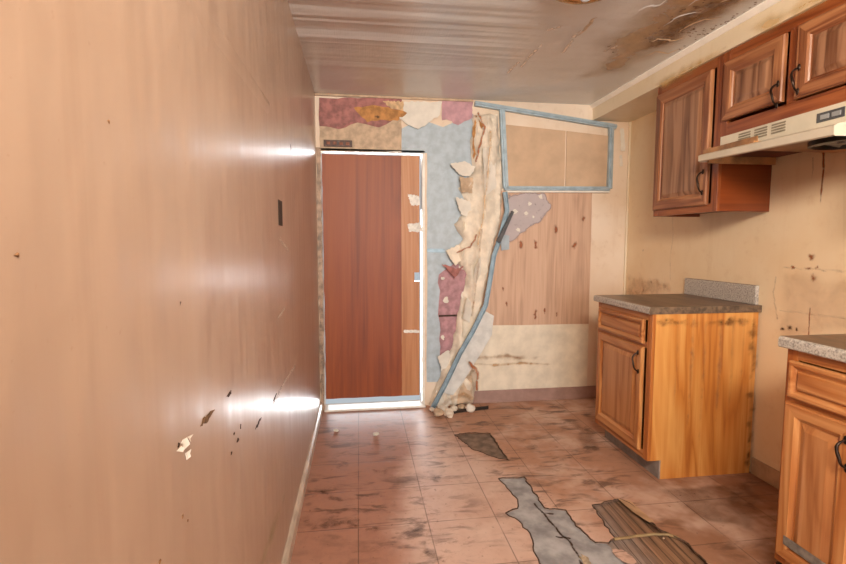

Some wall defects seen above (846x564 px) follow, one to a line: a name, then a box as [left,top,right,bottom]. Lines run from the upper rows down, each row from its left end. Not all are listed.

damp [607,0,739,69]
peeling [319,97,407,129]
peeling [442,101,483,217]
peeling [438,245,481,371]
spalling [177,434,193,460]